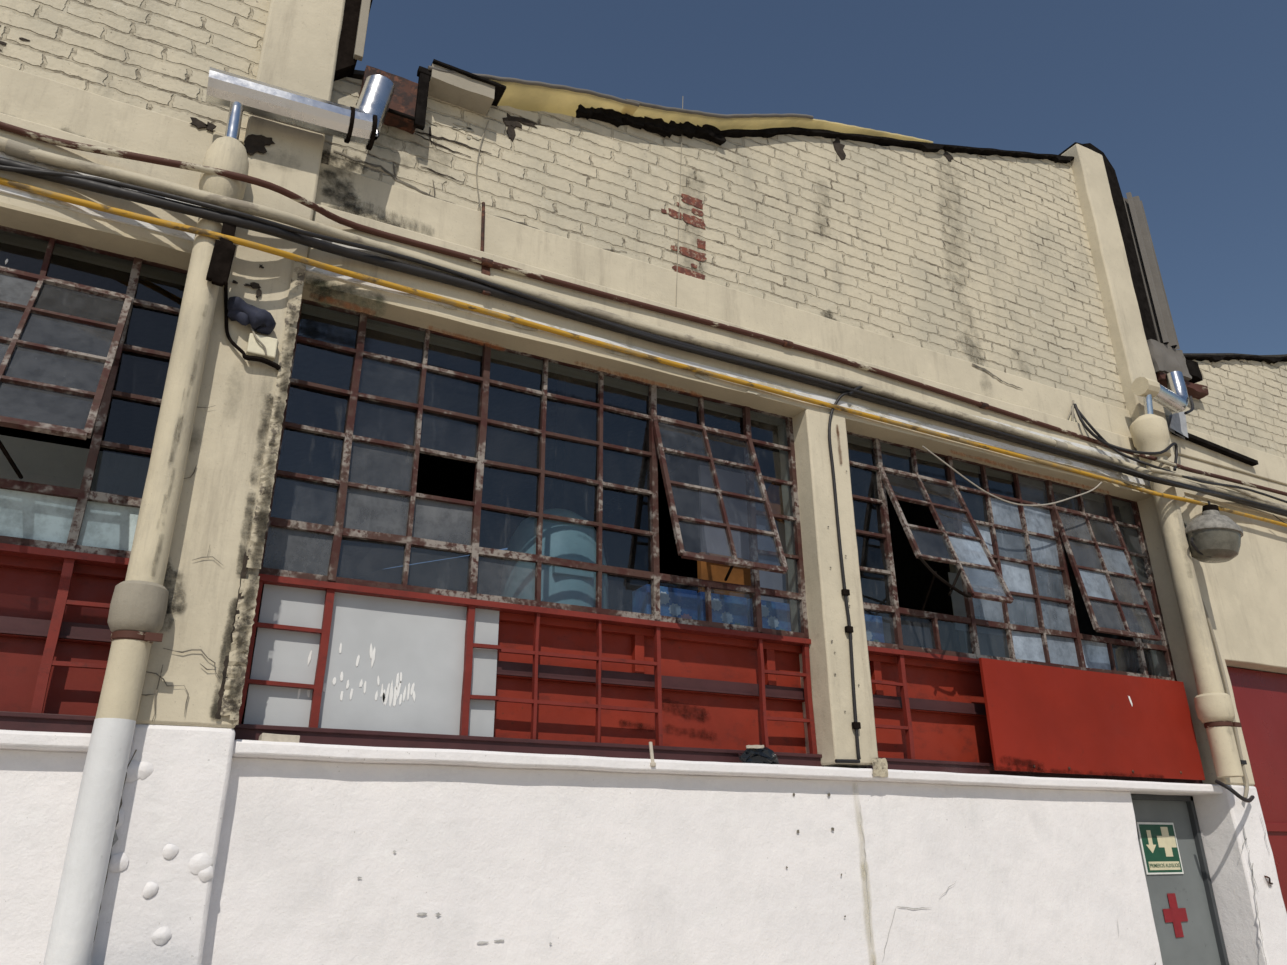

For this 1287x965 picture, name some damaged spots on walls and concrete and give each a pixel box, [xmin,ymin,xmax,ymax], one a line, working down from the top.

spalling [244,134,275,155]
damp [321,151,400,227]
crack [333,127,491,204]
crack [493,215,550,233]
peeling [661,193,707,280]
spalling [833,137,846,160]
damp [211,309,297,718]
crack [141,648,221,721]
crack [94,750,137,940]
crack [859,803,957,962]